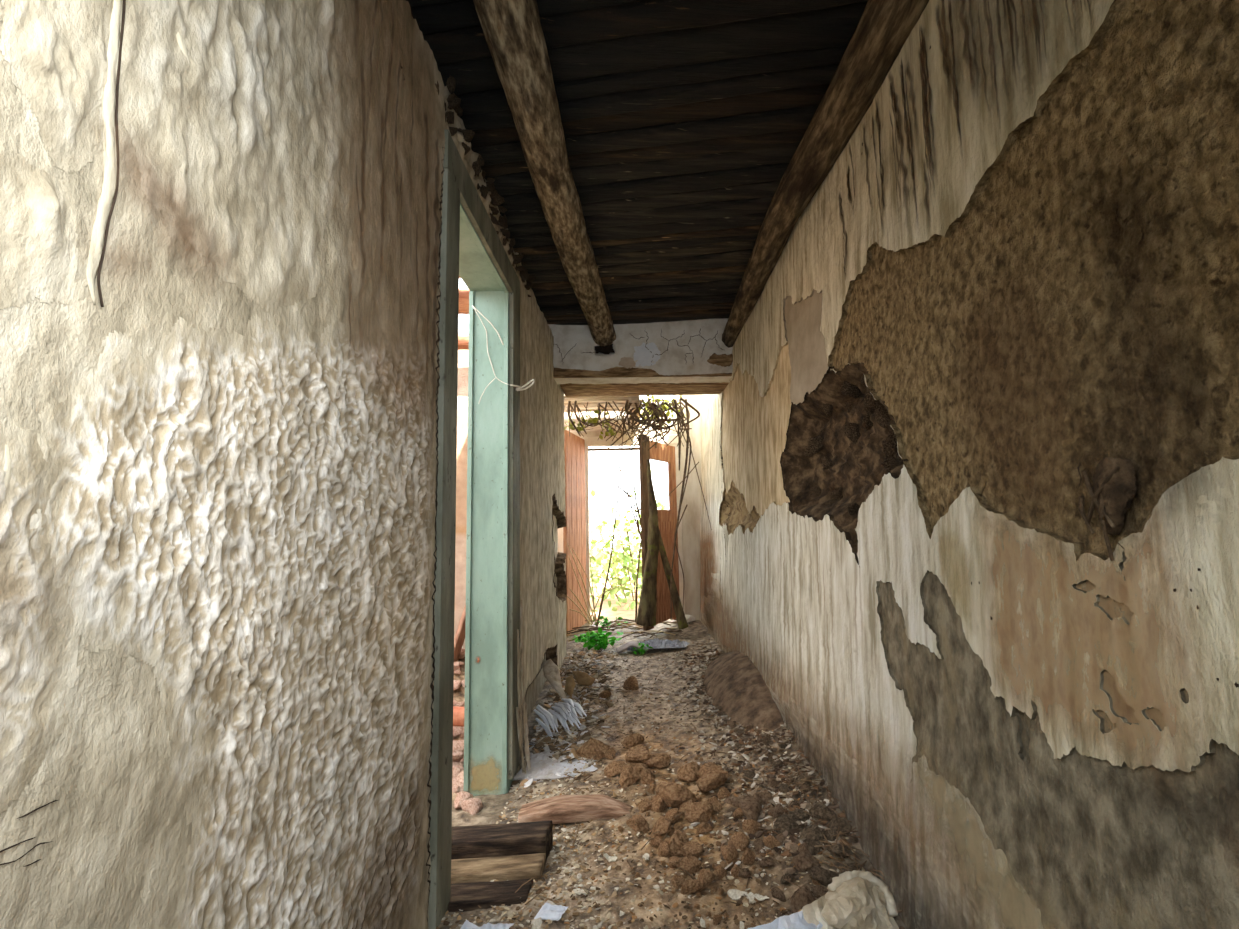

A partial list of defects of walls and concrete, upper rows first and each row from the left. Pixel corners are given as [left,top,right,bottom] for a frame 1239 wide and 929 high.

leakage [839,0,1045,260]
flaking render [707,0,1239,580]
flaking render [552,494,567,602]
leakage [781,715,952,929]
leakage [918,752,1055,929]